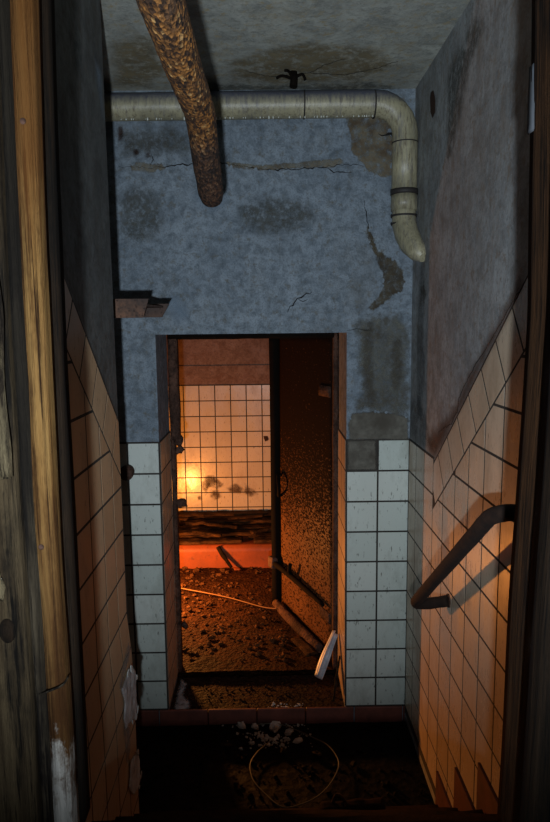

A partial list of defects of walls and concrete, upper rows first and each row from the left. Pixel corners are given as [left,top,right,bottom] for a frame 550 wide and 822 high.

crack [119,155,192,169]
crack [220,162,364,173]
spalling [226,118,392,178]
peeling [364,201,405,311]
water stain [357,317,410,414]
spalling [120,644,142,794]